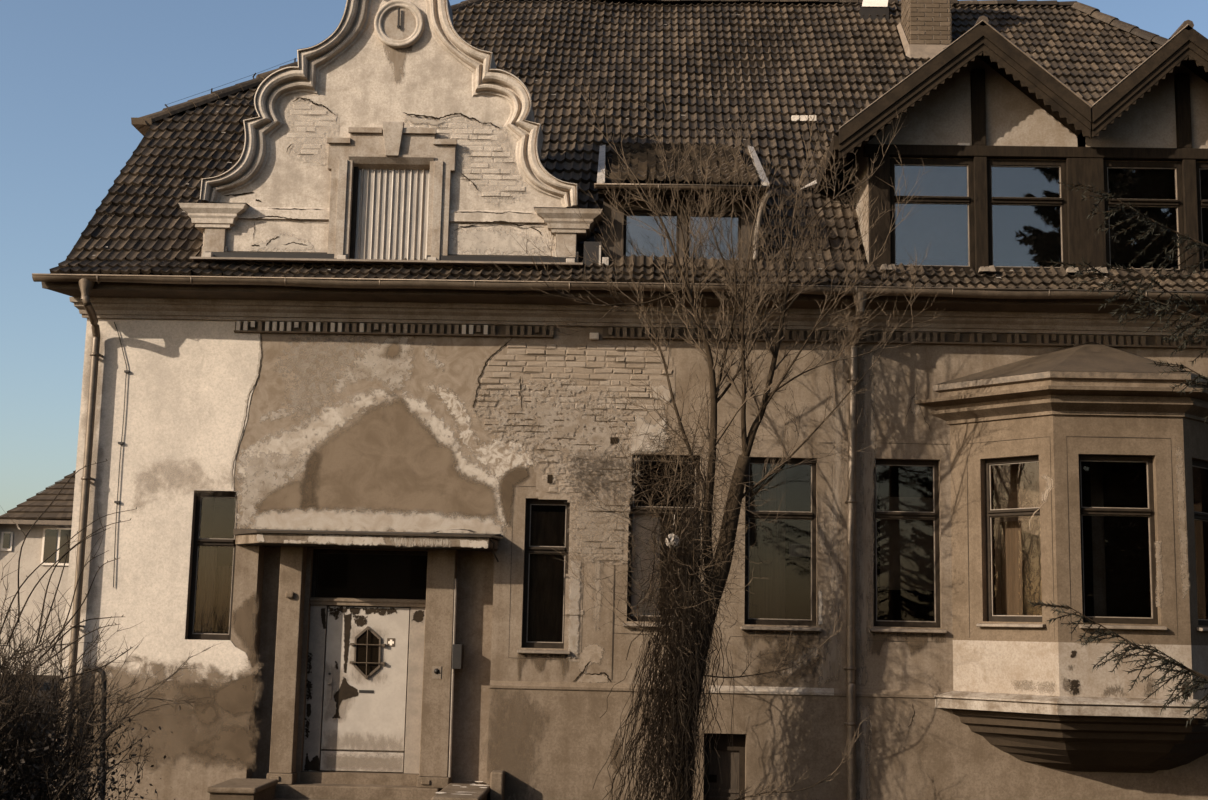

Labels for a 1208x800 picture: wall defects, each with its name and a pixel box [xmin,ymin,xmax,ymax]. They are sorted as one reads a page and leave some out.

water stain [383,45,412,82]
flaking render [284,96,340,165]
flaking render [404,116,526,205]
flaking render [230,334,675,683]
peeling [305,652,313,737]
peeling [304,753,320,771]